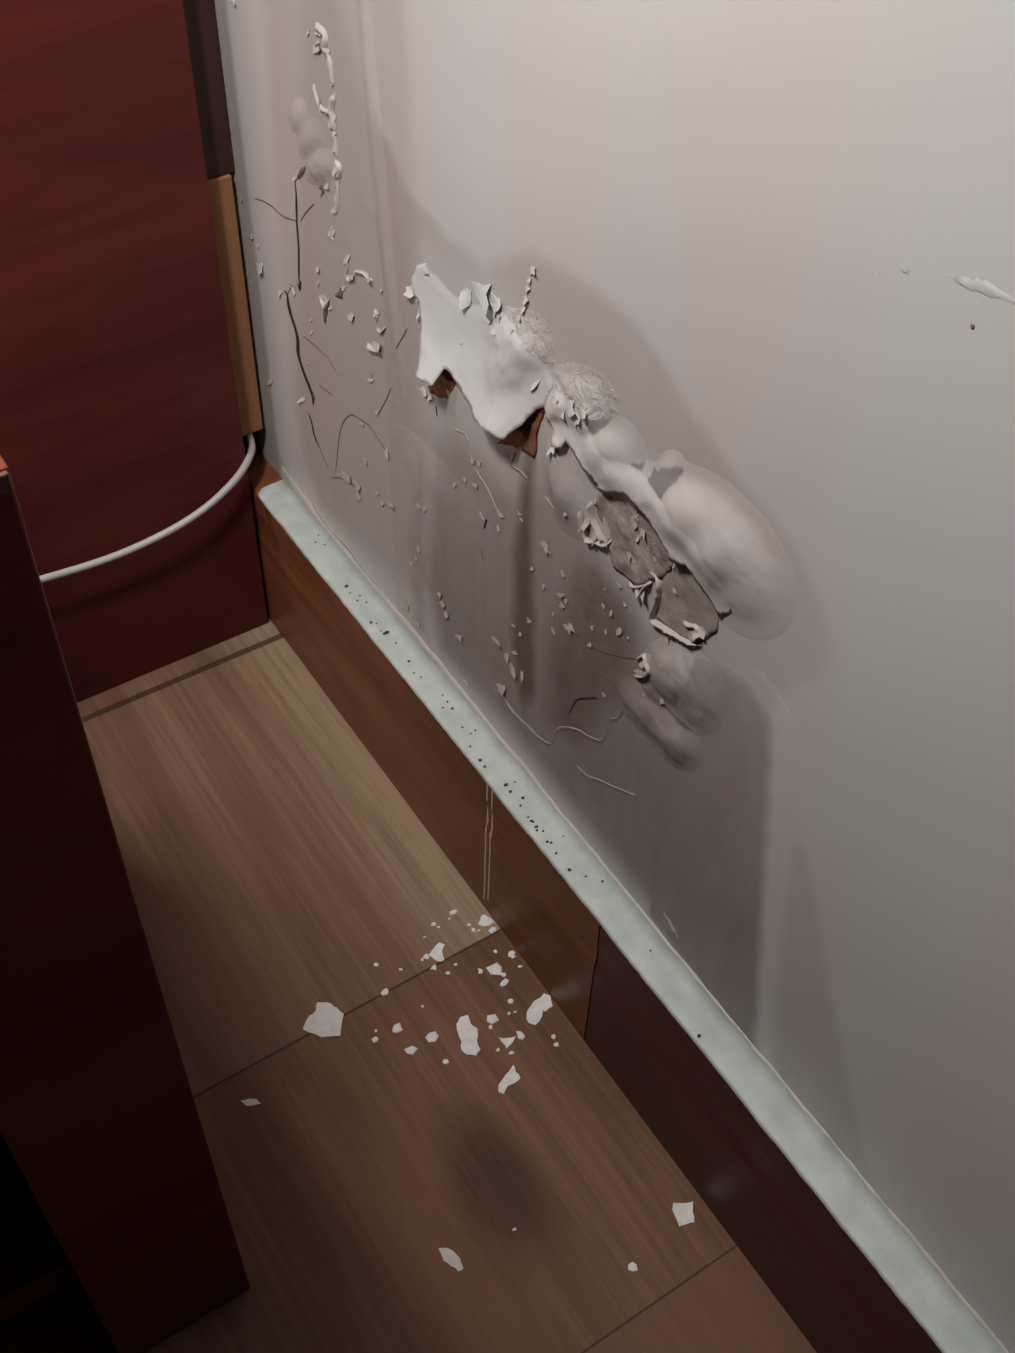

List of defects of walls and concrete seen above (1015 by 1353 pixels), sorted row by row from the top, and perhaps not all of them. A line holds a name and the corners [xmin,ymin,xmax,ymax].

peeling [306,22,342,240]
peeling [309,254,382,335]
peeling [366,309,385,354]
crack [254,184,391,599]
peeling [403,263,733,648]
peeling [491,617,531,695]
spalling [633,653,653,678]